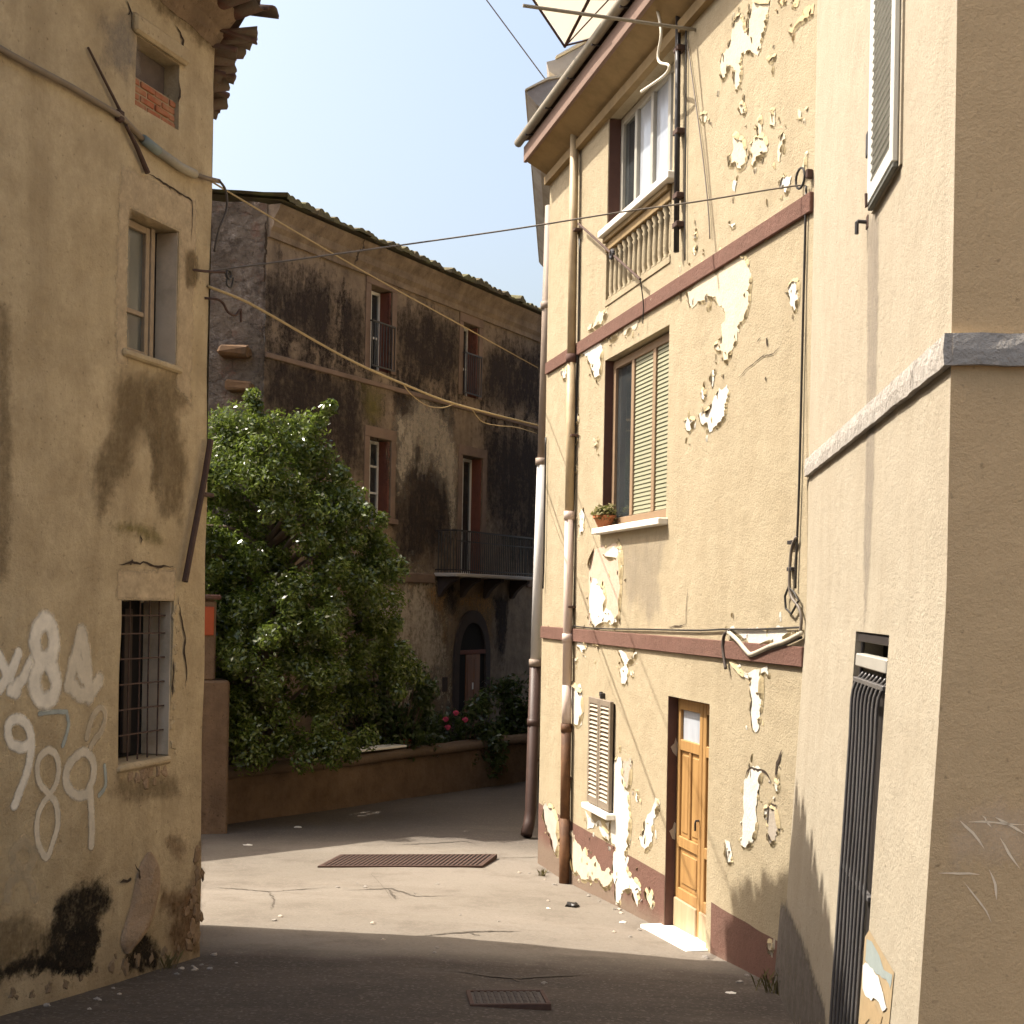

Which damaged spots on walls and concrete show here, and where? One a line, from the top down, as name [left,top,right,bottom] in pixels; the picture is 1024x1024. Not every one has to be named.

peeling [717,0,814,203]
peeling [676,220,704,278]
peeling [679,254,753,444]
damp [97,376,187,511]
damp [262,268,541,568]
crack [121,536,173,568]
flaking render [583,539,625,630]
peeling [728,659,771,733]
peeling [541,745,660,910]
peeling [723,754,783,866]
damp [0,880,111,981]